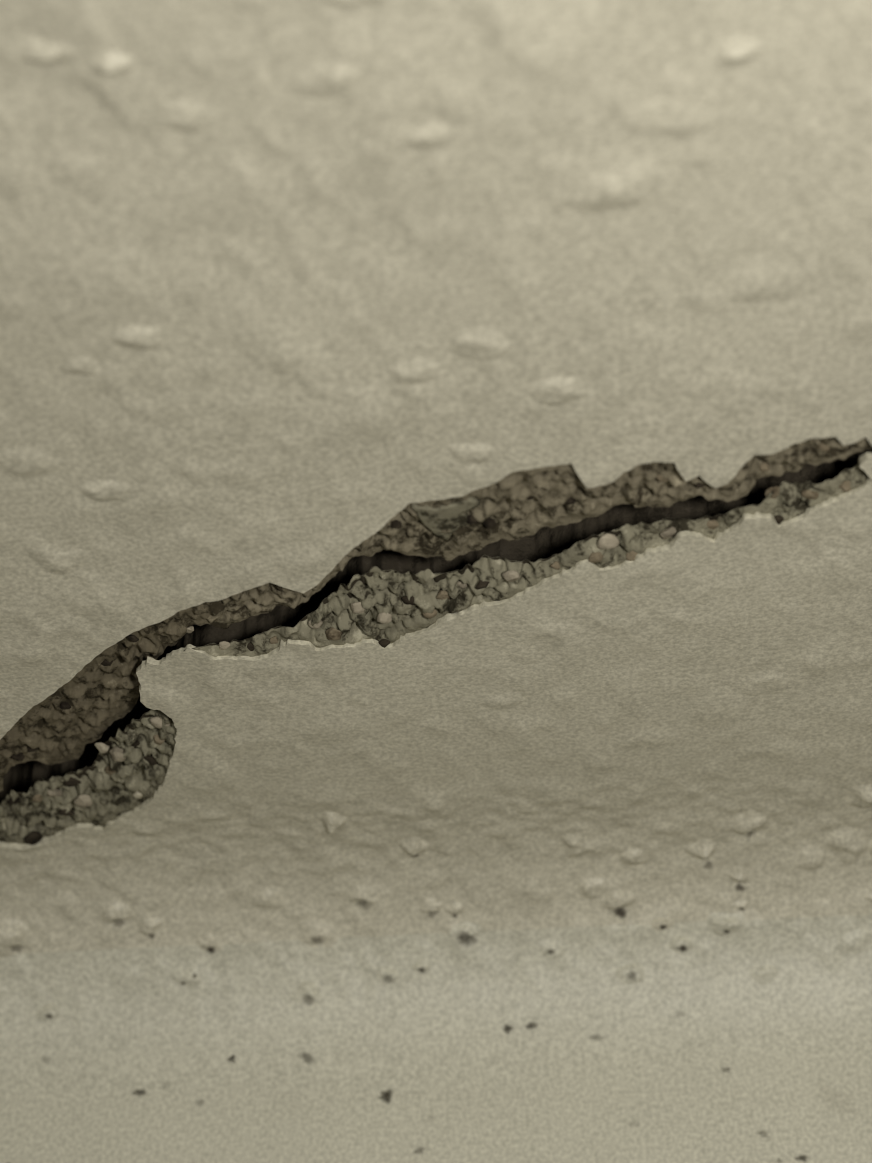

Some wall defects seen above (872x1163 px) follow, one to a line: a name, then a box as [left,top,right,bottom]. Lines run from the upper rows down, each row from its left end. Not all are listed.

crack [157,439,872,660]
crack [0,695,153,806]